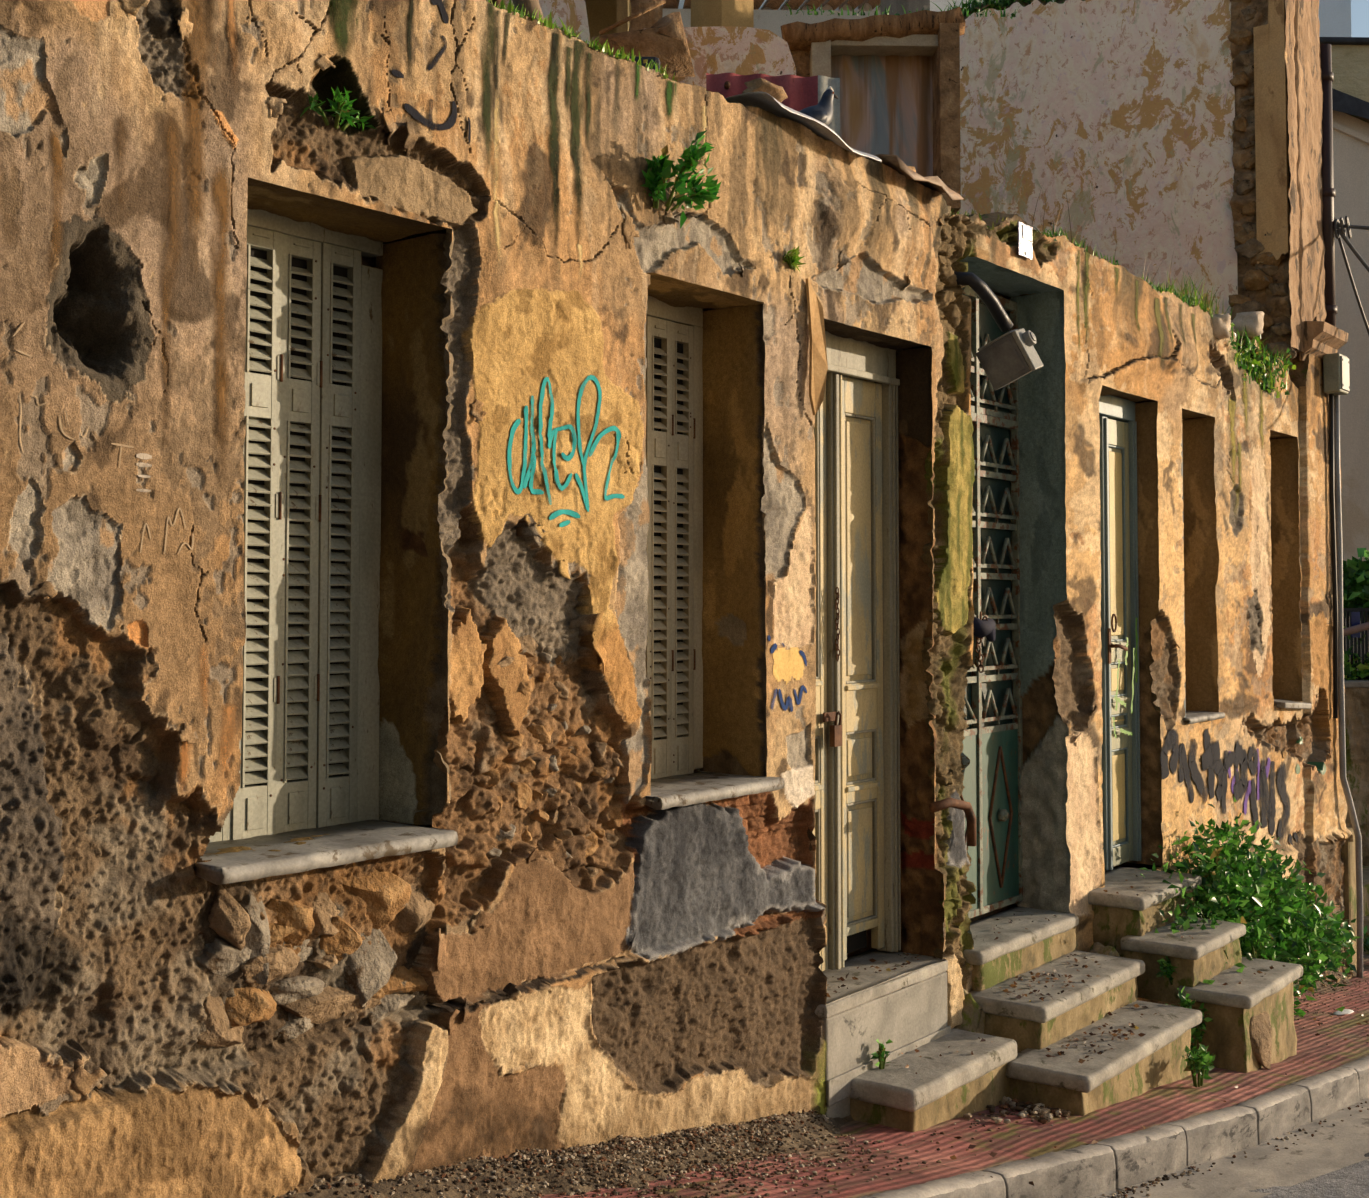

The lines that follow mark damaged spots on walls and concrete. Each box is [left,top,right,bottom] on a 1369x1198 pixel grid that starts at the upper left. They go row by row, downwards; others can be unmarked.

flaking render [72,0,193,101]
crack [248,0,330,83]
leakage [408,0,420,68]
leakage [482,3,510,158]
leakage [548,33,592,220]
leakage [666,81,676,116]
crack [189,524,209,641]
flaking render [0,24,659,1181]
flaking render [806,213,1061,1028]
peeling [1052,598,1103,915]
flaking render [702,791,816,882]
flaking render [591,900,827,1094]